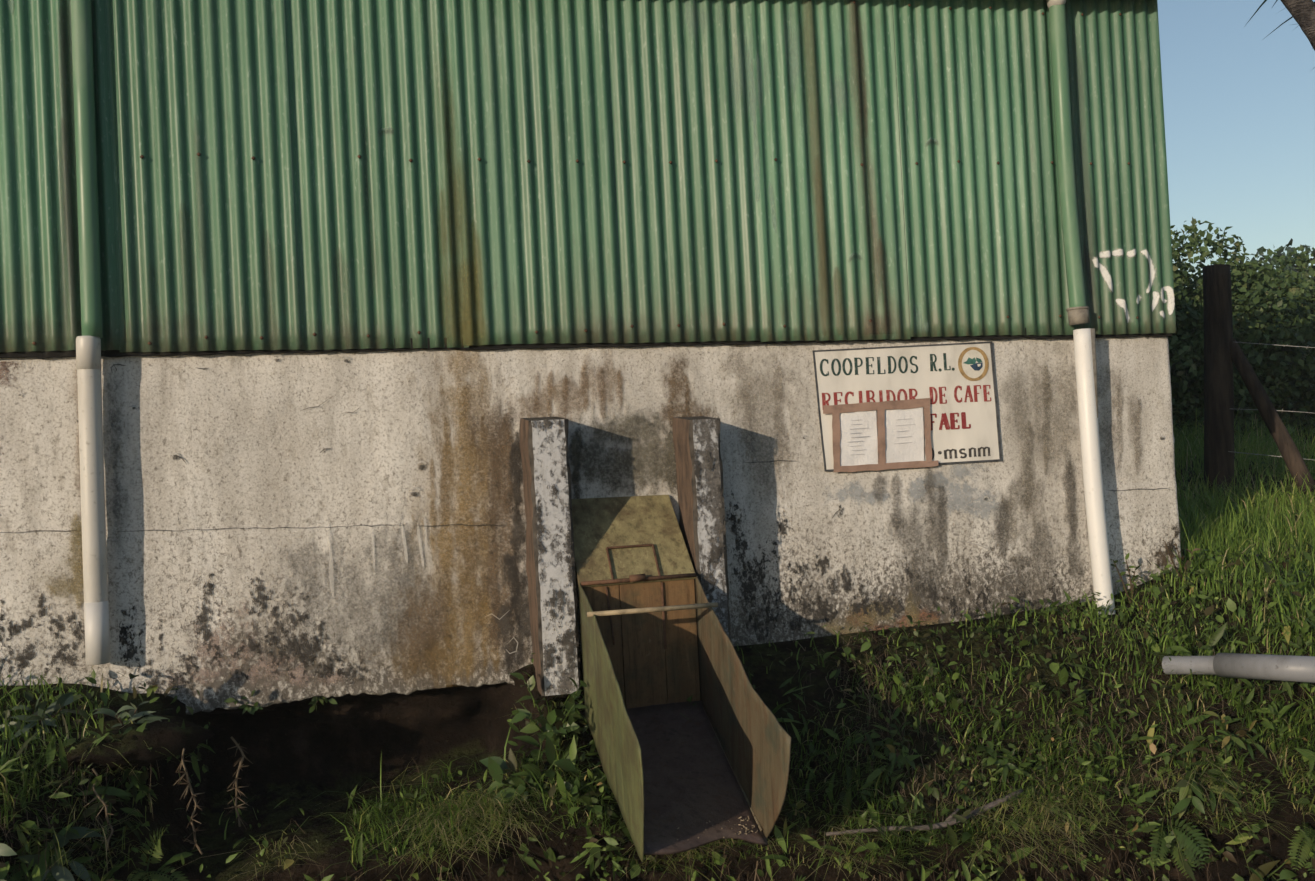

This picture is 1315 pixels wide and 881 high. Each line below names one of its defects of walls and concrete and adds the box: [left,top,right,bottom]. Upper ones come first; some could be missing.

leakage [0,515,85,681]
leakage [119,572,367,696]
corrosion [407,265,498,679]
peeling [529,414,580,697]
peeling [692,417,727,602]
leakage [725,466,1088,644]
leakage [1150,524,1181,581]